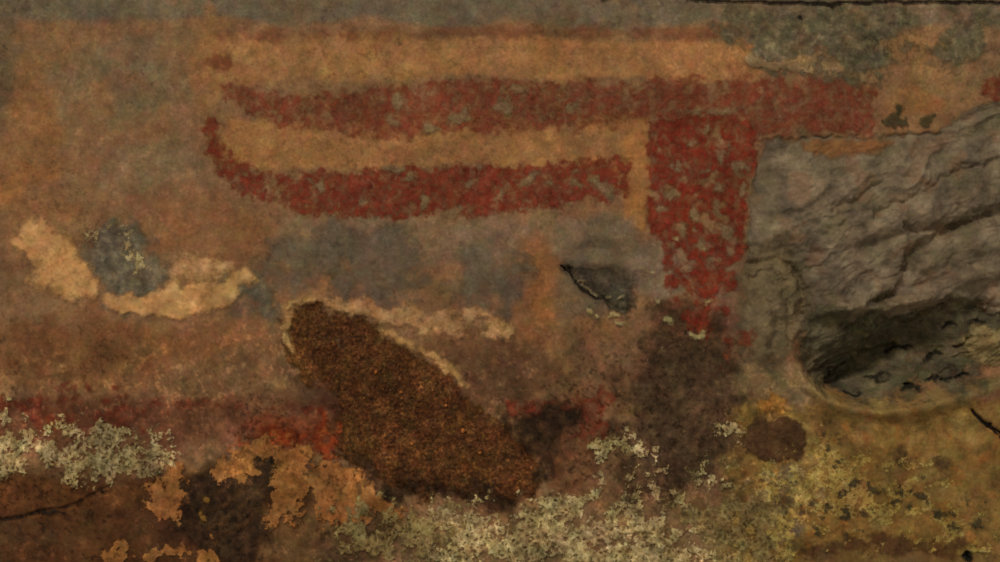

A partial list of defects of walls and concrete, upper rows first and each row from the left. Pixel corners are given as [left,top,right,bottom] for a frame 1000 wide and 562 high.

peeling [801,139,891,158]
peeling [884,292,936,310]
peeling [943,319,1000,367]
spalling [901,372,968,391]